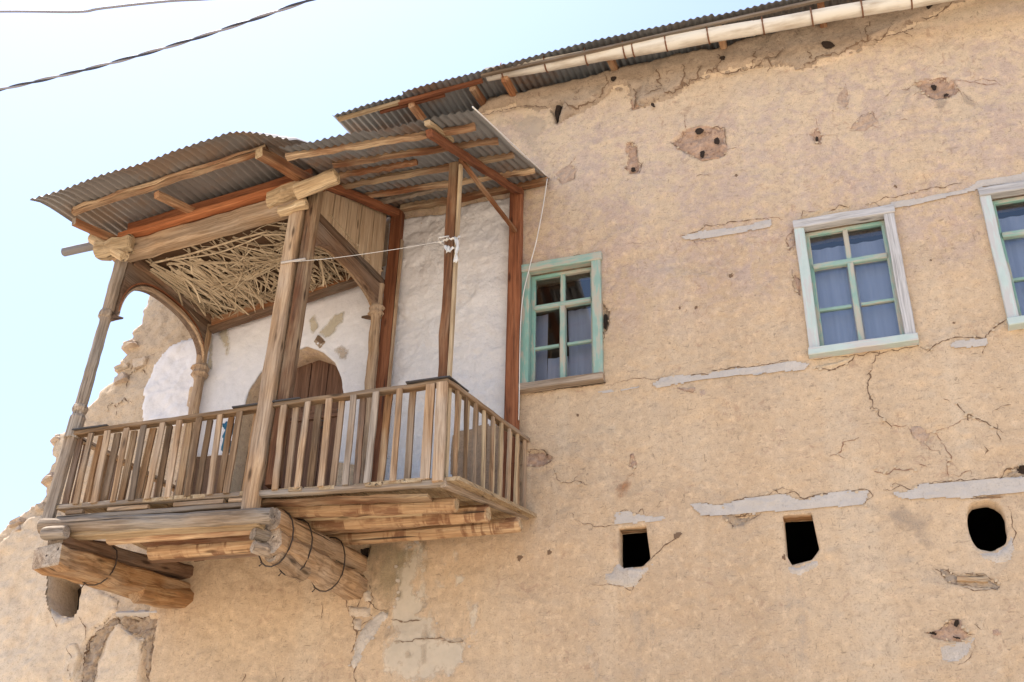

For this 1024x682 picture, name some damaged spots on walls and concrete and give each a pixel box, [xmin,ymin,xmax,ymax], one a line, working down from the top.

spalling [478,0,979,124]
spalling [884,77,1002,102]
spalling [625,139,642,174]
spalling [673,115,736,161]
crack [812,319,1007,427]
spalling [527,447,552,467]
crack [702,399,1017,543]
crack [572,501,661,527]
spalling [936,568,1000,591]
peeling [348,541,471,682]
spalling [79,616,158,682]
spalling [927,619,1001,665]